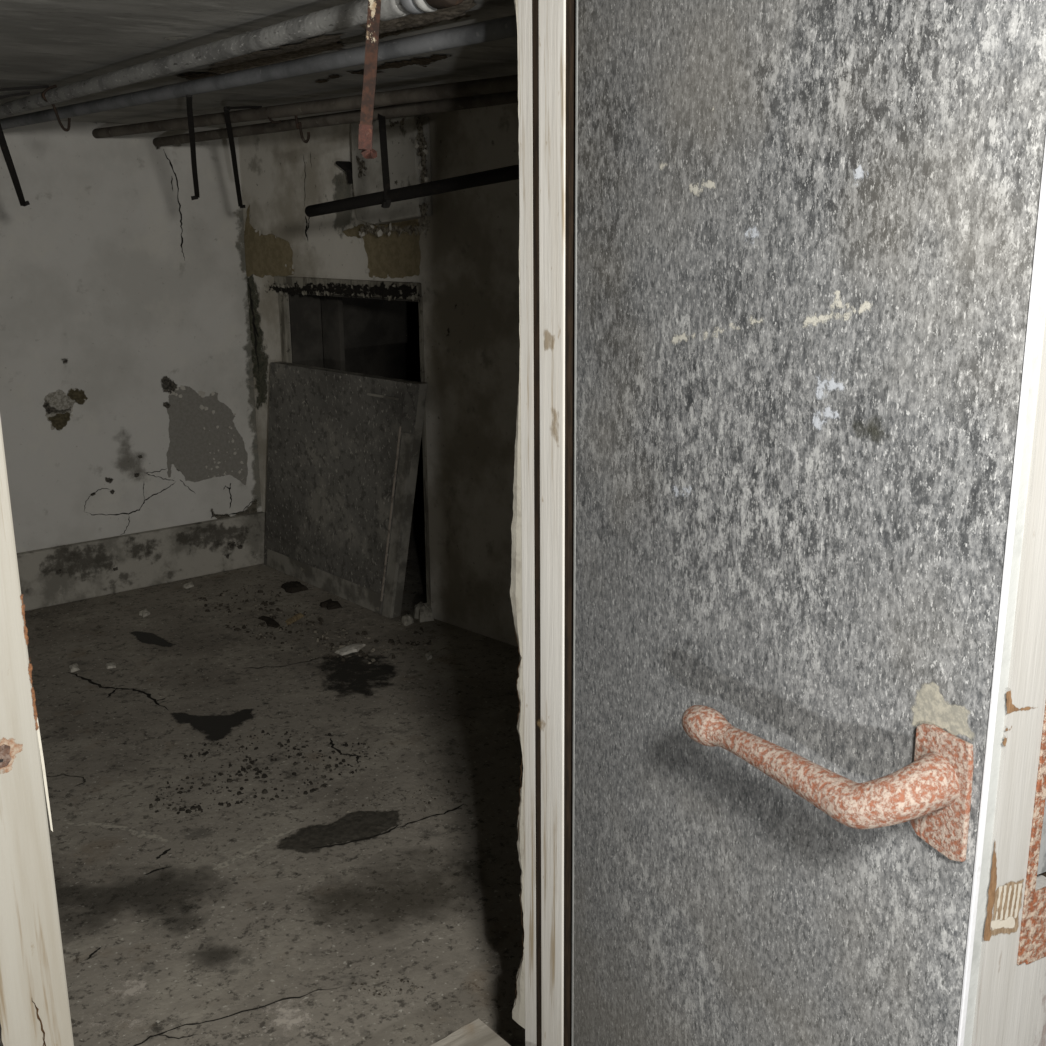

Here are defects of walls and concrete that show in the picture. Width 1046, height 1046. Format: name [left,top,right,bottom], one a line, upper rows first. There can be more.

crack [164,151,185,261]
flaking render [244,205,430,302]
flaking render [43,388,88,431]
flaking render [161,376,248,485]
crack [84,469,255,535]
crack [68,672,168,710]
damp [319,653,396,696]
damp [171,703,268,741]
corrosion [0,737,23,773]
peeling [983,842,1022,941]
crack [32,1001,46,1046]
crack [134,987,340,1046]